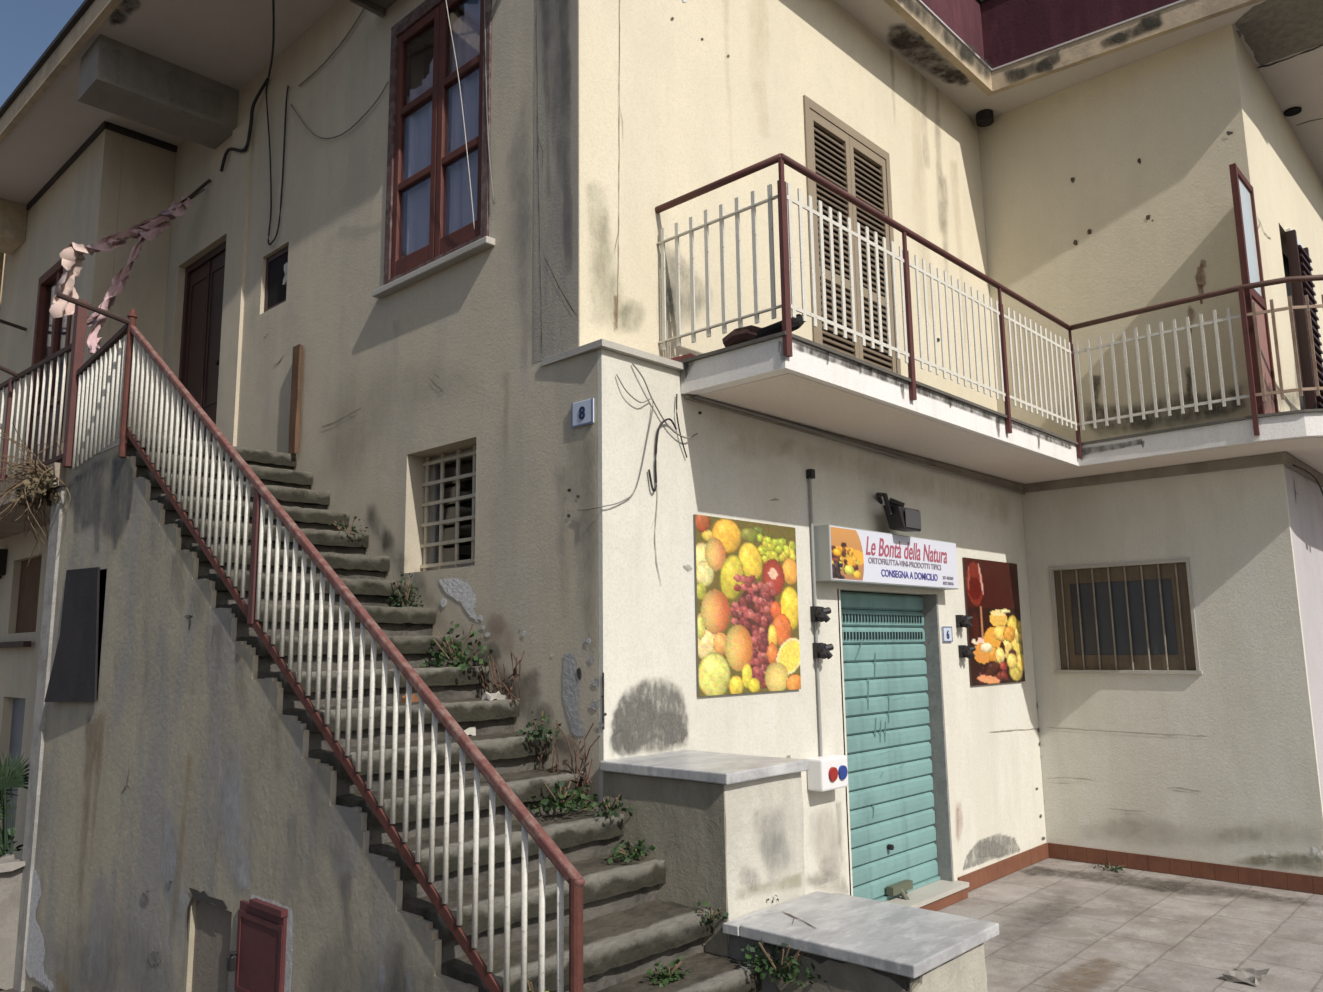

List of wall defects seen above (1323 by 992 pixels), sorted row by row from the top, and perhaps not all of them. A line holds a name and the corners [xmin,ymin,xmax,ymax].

damp [890,0,1059,85]
damp [1103,14,1162,45]
damp [67,458,133,552]
peeling [439,577,490,637]
peeling [551,638,607,736]
damp [612,681,688,753]
damp [963,835,1020,870]